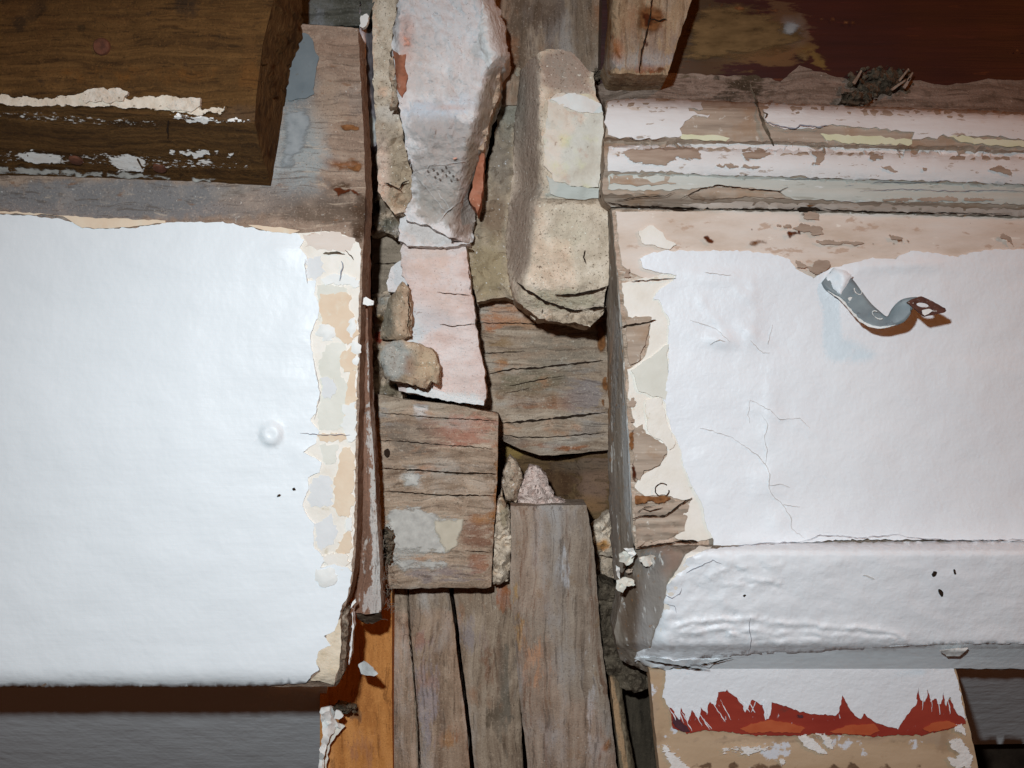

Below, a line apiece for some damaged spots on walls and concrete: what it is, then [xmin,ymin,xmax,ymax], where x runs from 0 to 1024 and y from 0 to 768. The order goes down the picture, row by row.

peeling [0,87,245,126]
peeling [0,149,247,182]
peeling [543,93,701,200]
peeling [717,149,770,170]
peeling [0,211,166,229]
peeling [777,211,874,246]
peeling [795,260,830,275]
peeling [249,225,374,587]
peeling [625,316,675,480]
crack [701,401,1020,546]
spalling [616,498,692,593]
peeling [311,618,342,685]